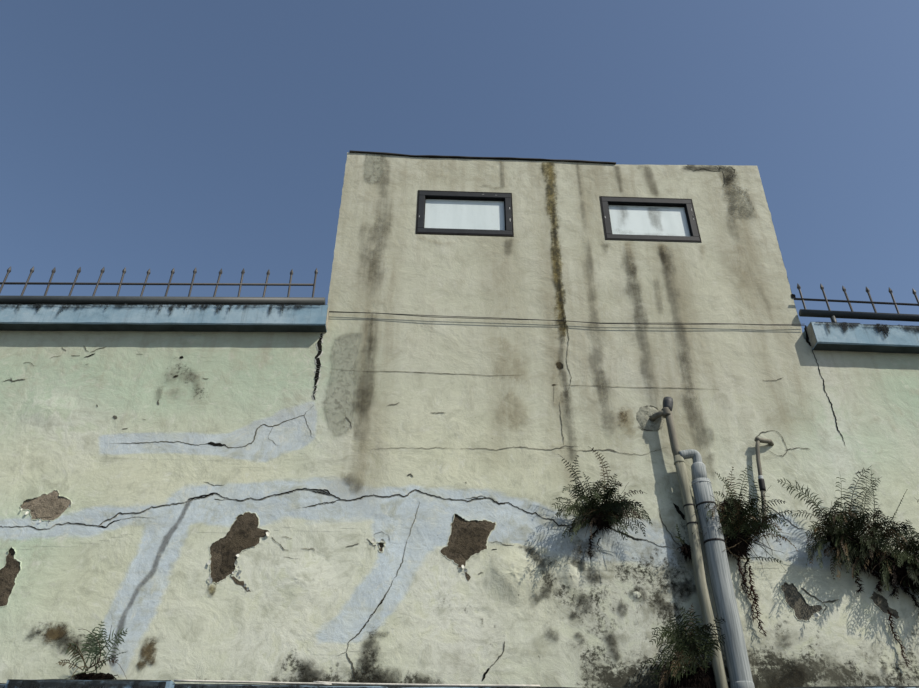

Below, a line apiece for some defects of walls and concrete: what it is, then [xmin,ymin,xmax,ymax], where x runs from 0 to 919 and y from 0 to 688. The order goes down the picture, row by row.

damp [542,162,568,336]
crack [5,346,105,381]
crack [97,333,503,448]
crack [804,326,846,447]
flaking render [19,489,72,523]
flaking render [0,547,22,608]
flaking render [207,511,270,591]
crack [0,473,685,681]
flaking render [439,513,497,581]
mould [631,580,695,610]
damp [0,633,401,688]
mould [606,634,619,660]